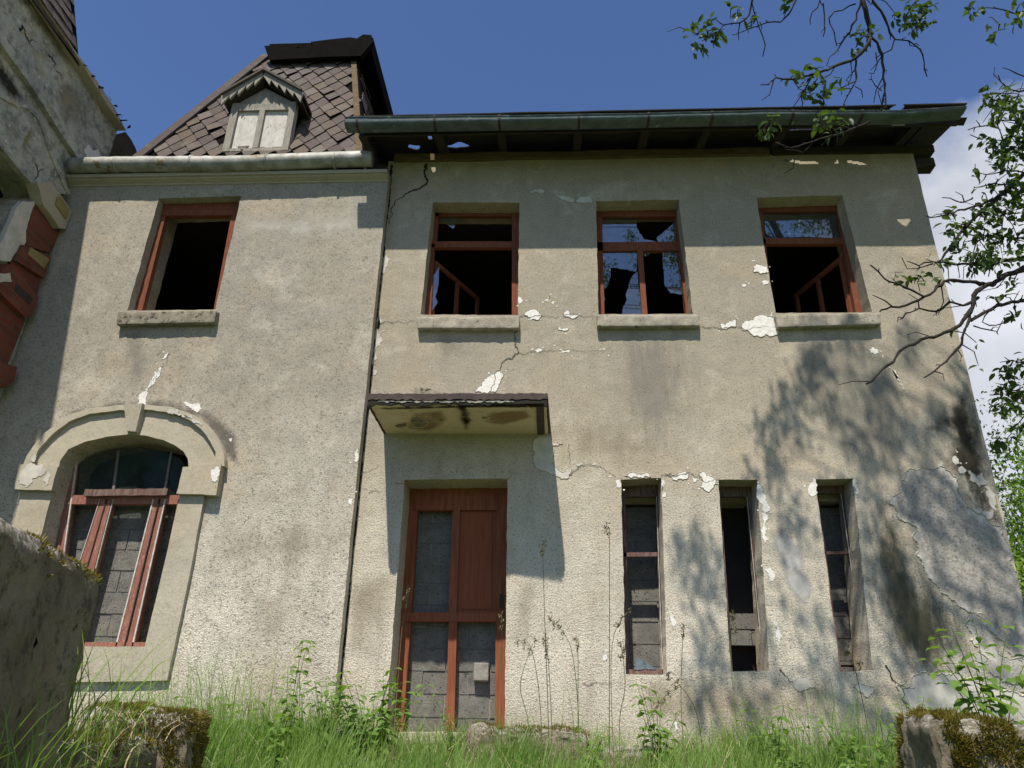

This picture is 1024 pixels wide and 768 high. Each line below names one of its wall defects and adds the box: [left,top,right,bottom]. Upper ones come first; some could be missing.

peeling [742,260,773,287]
crack [475,308,609,393]
peeling [167,401,203,425]
damp [381,403,544,426]
crack [336,164,429,719]
peeling [9,453,50,505]
crack [609,467,719,494]
peeling [756,474,811,602]
peeling [887,450,1024,722]